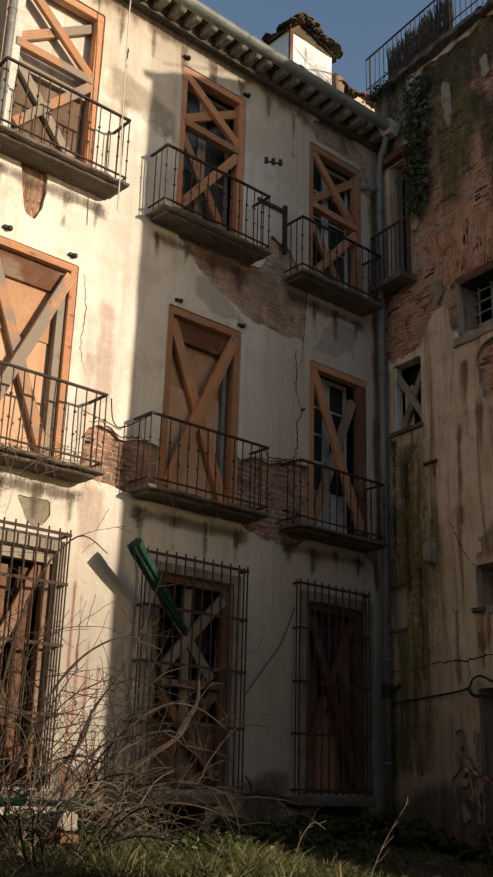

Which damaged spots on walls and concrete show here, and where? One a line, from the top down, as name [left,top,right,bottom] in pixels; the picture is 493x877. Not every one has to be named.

flaking render [21,162,49,219]
flaking render [384,14,493,369]
flaking render [179,235,309,340]
crack [253,292,307,464]
flaking render [475,336,493,399]
flaking render [78,425,159,492]
flaking render [236,454,308,547]
crack [391,654,493,681]
flaking render [451,730,487,829]